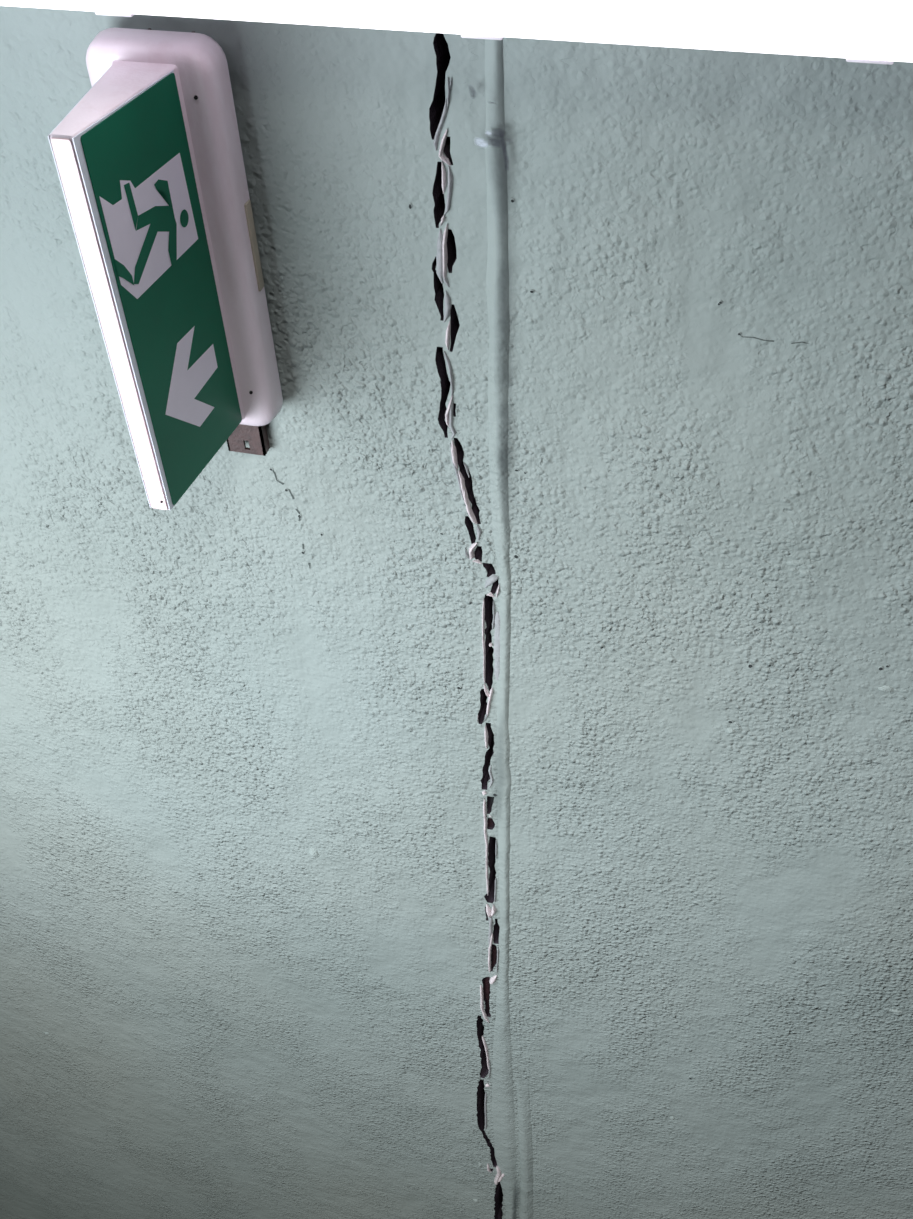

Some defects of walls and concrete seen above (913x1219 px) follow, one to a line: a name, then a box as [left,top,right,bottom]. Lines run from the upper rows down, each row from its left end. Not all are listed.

crack [429,33,504,1219]